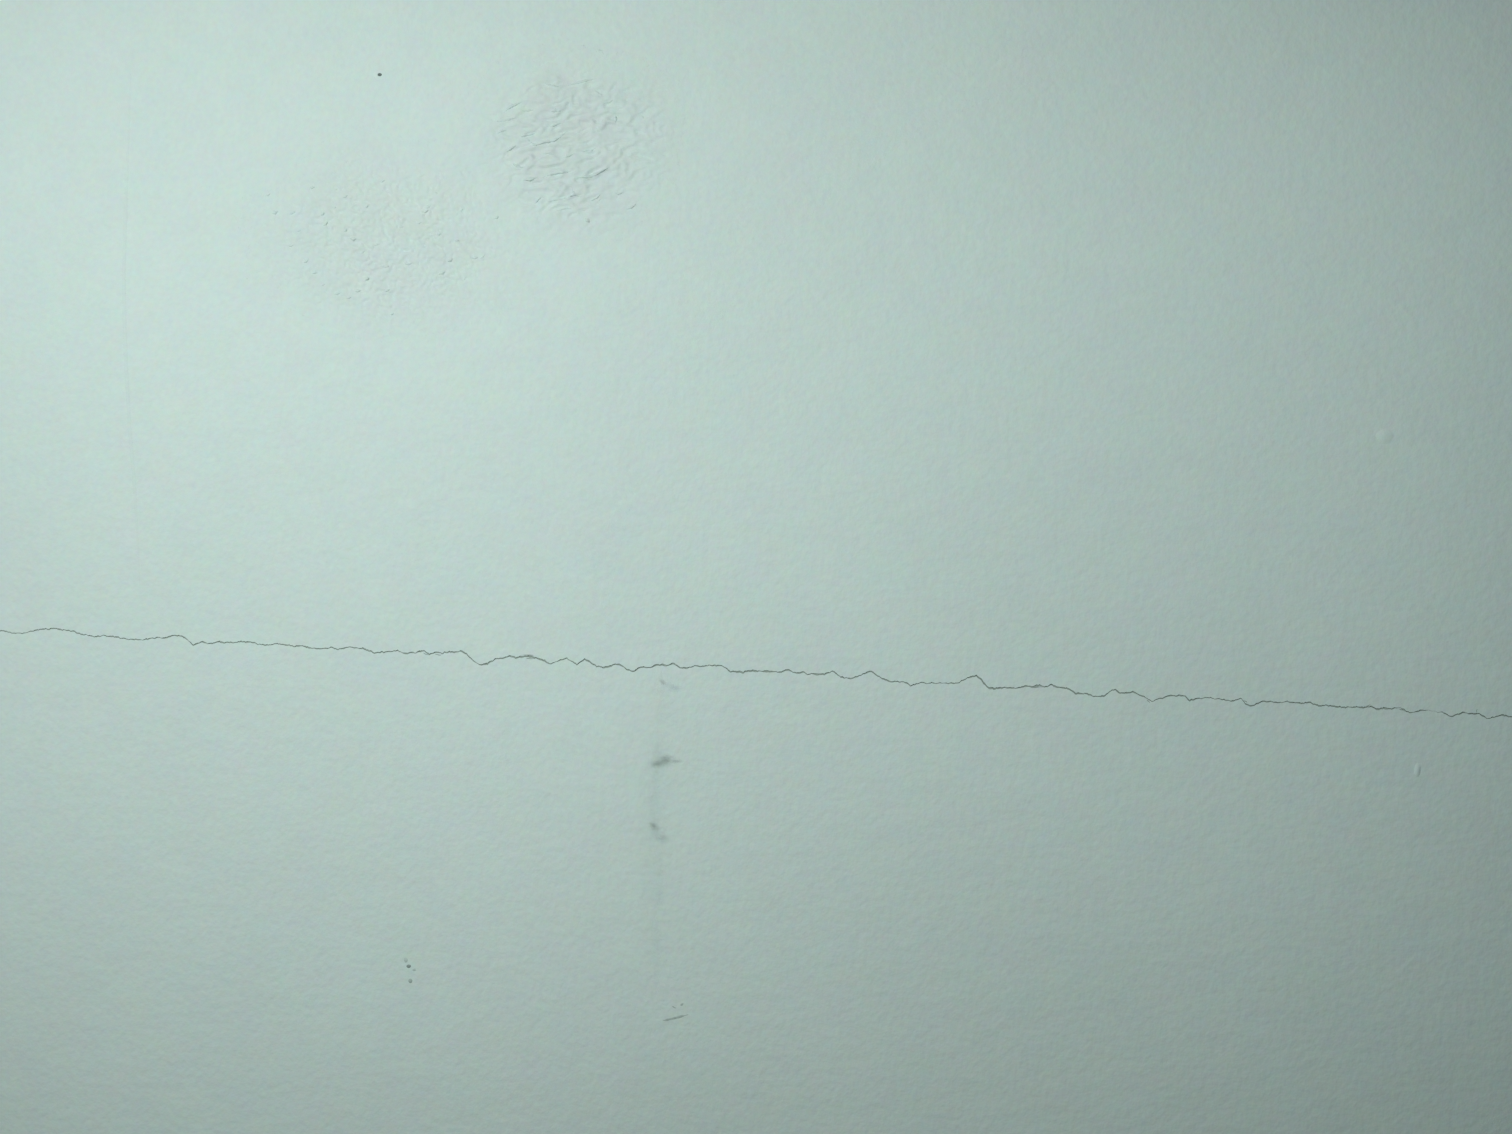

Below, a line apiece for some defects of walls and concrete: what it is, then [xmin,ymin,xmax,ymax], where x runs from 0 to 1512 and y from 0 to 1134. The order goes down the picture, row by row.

crack [0,628,1512,719]